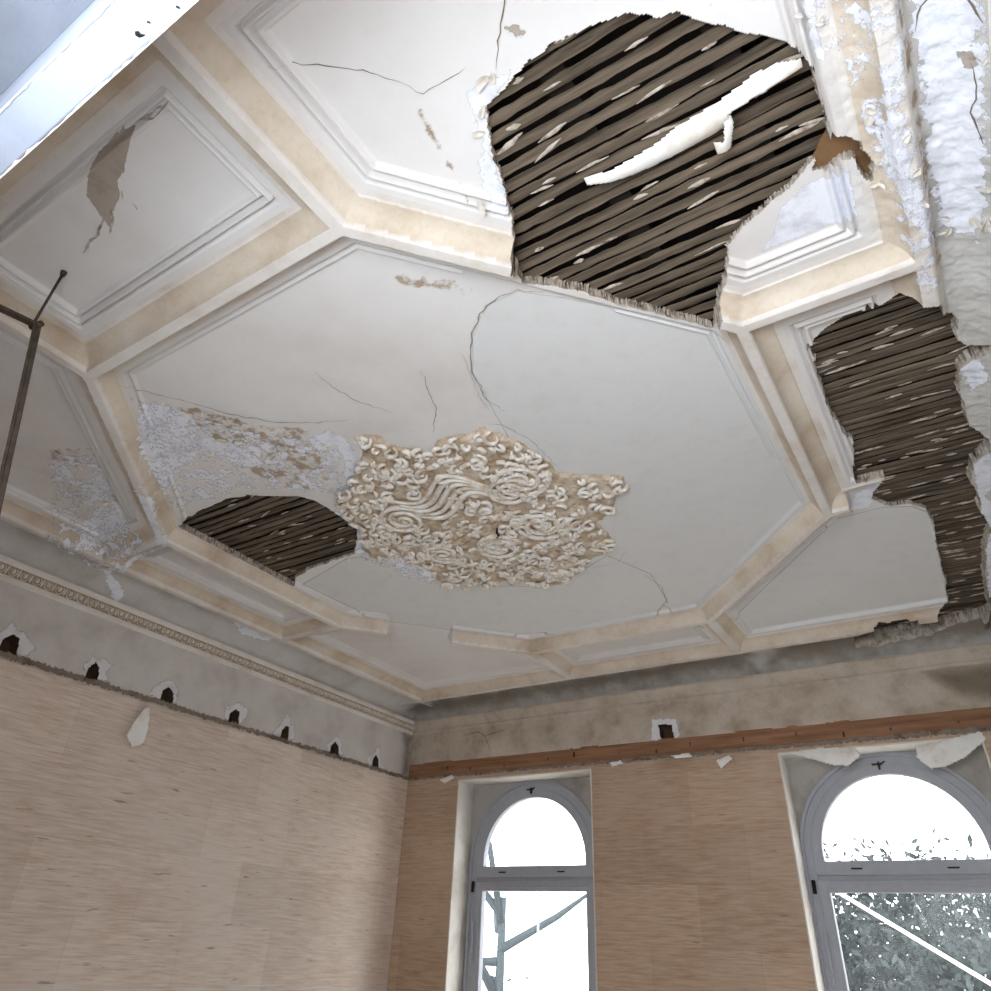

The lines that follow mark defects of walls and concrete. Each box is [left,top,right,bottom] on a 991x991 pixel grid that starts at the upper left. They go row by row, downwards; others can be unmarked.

peeling [0,0,199,179]
peeling [83,101,169,253]
crack [269,62,466,94]
crack [496,0,505,62]
flaking render [466,0,991,330]
crack [967,0,983,23]
crack [970,62,983,143]
crack [463,289,554,464]
flaking render [39,398,436,602]
flaking render [807,293,991,648]
spalling [0,623,35,656]
spalling [83,656,113,682]